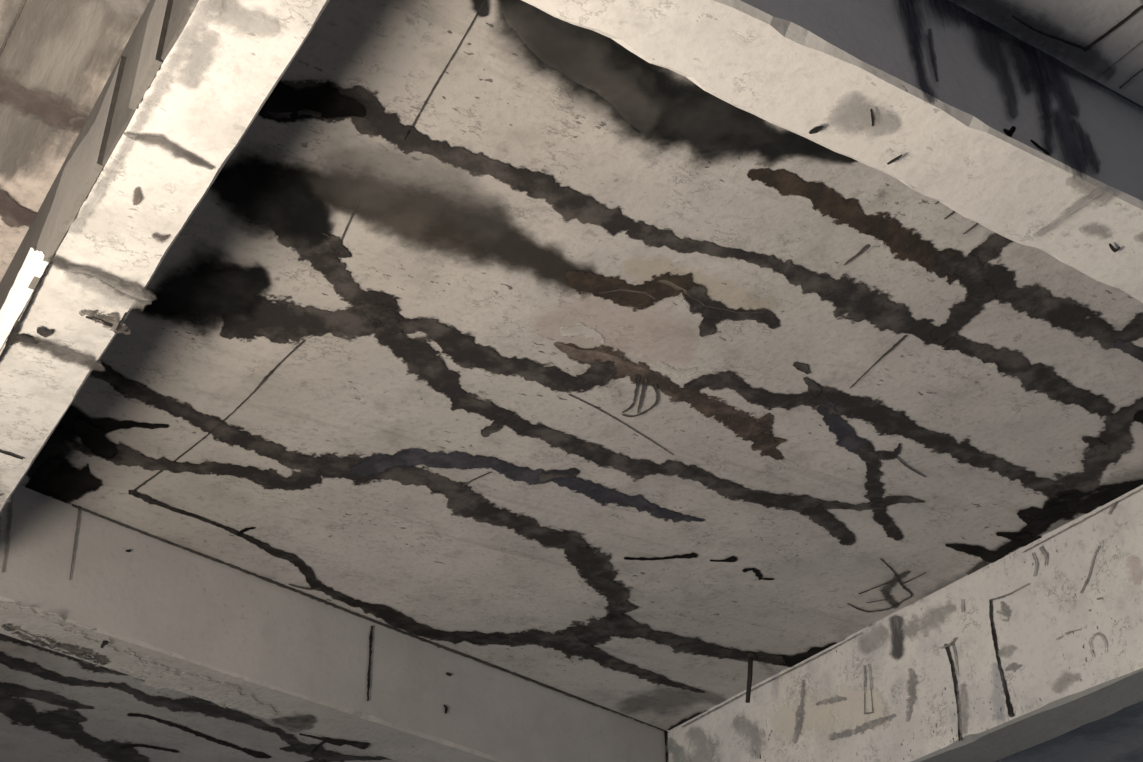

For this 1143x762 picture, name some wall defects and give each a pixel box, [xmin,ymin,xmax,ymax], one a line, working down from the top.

water stain [0,0,150,227]
crack [69,75,213,234]
crack [170,0,221,68]
water stain [177,0,276,89]
water stain [471,0,857,164]
water stain [899,0,1143,237]
water stain [290,168,780,337]
crack [258,0,1143,563]
crack [0,156,884,762]
crack [848,558,926,613]
crack [940,637,961,741]
crack [989,583,1029,717]